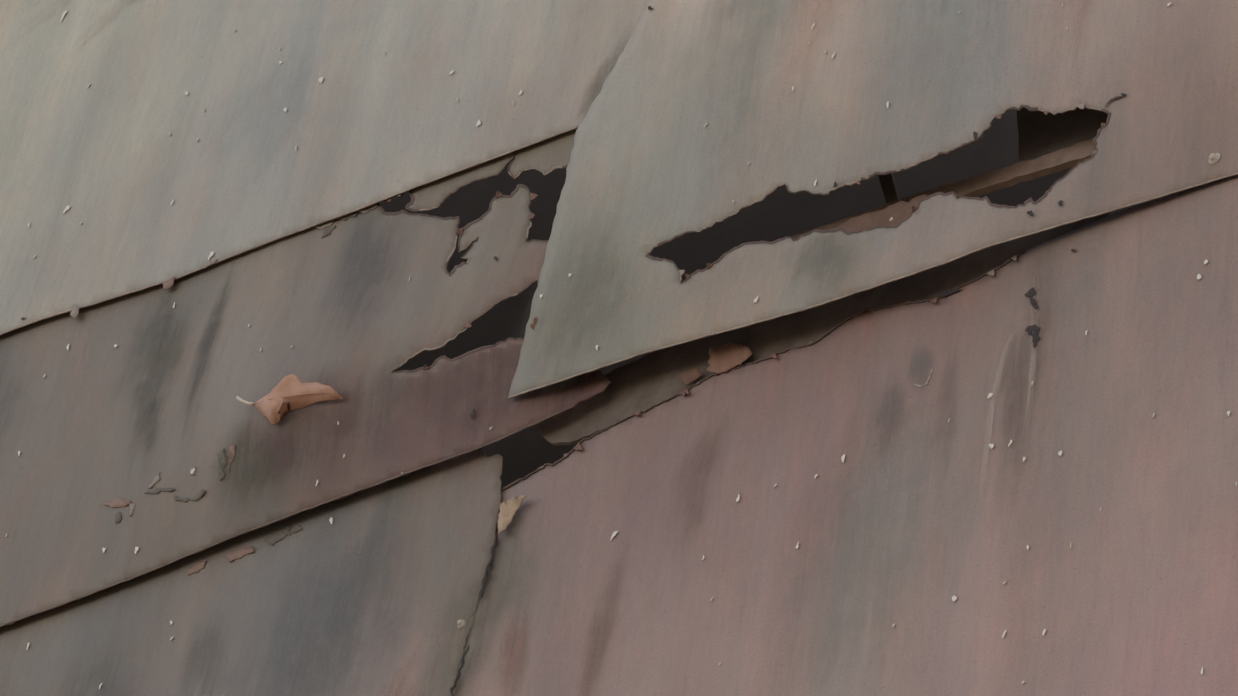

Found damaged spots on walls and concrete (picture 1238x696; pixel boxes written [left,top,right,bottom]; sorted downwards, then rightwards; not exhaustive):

hole [1024,287,1038,309]
hole [1025,324,1040,348]
corrosion [678,342,753,385]
peeling [103,472,206,523]